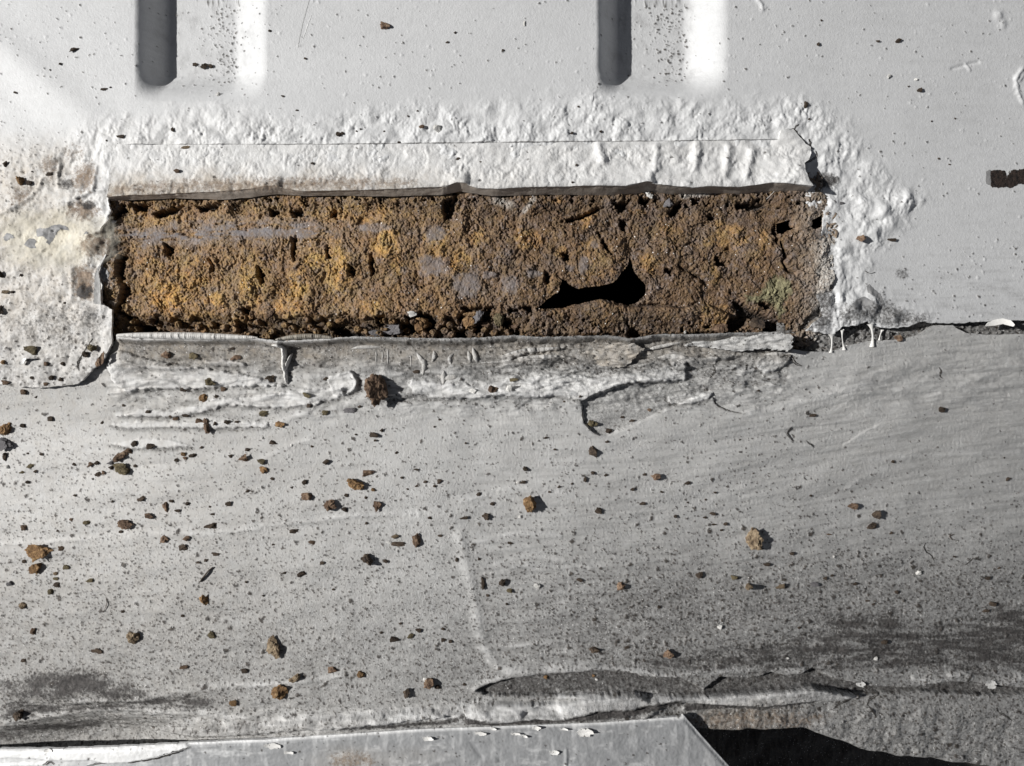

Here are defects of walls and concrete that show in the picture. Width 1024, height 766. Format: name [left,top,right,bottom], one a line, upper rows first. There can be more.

spalling [986,169,1024,188]